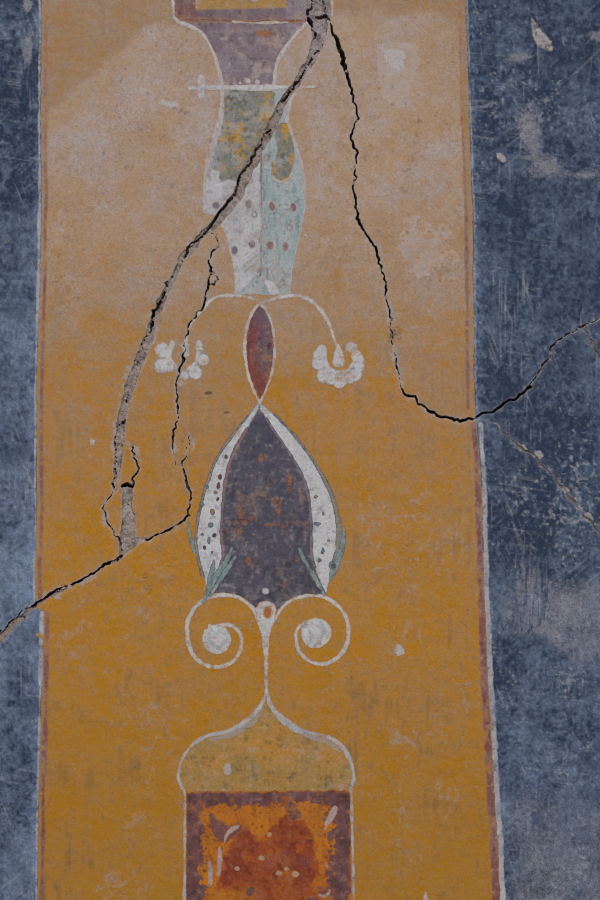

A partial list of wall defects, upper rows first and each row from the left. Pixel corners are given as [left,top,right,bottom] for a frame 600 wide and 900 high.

crack [0,0,600,644]